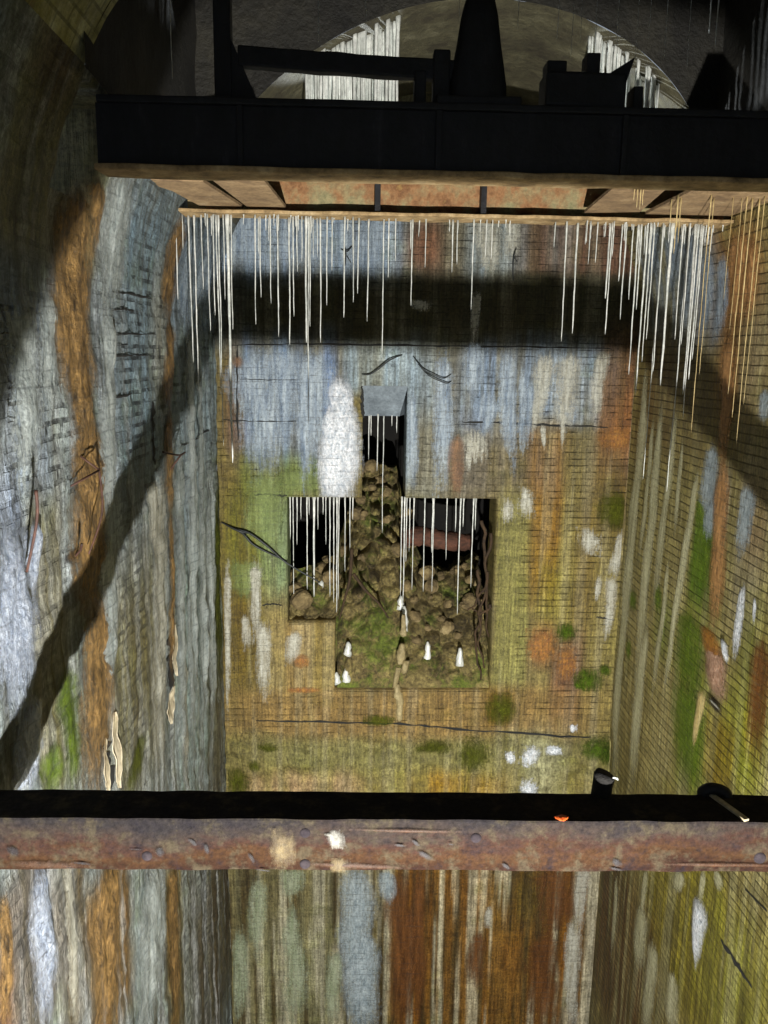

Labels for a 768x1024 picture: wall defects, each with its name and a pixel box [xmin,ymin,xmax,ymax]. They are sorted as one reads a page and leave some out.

leakage [181,218,387,316]
rust [52,183,115,778]
leakage [228,350,360,546]
leakage [408,398,417,473]
leakage [463,294,578,468]
rust [710,237,757,619]
leakage [595,380,717,778]
peeling [103,712,123,790]
crack [259,720,591,738]
rust [91,869,121,1024]
rust [385,878,426,1020]
rust [528,871,575,1024]